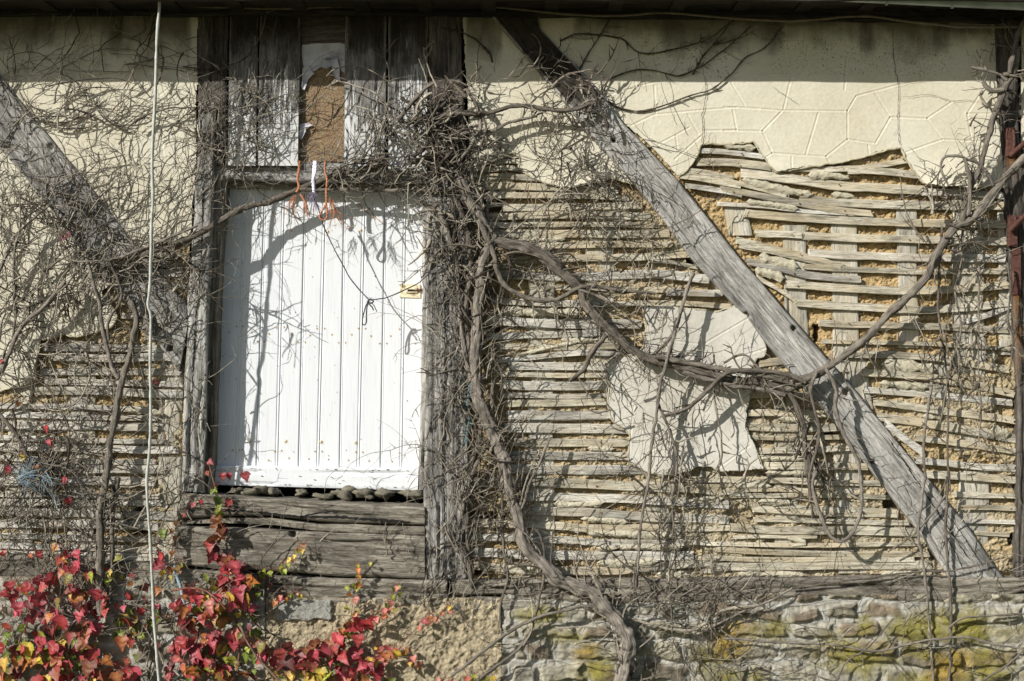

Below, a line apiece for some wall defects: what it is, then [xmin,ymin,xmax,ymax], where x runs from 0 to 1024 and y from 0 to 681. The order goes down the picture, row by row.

flaking render [678,140,1004,212]
flaking render [754,252,799,283]
flaking render [502,306,579,318]
flaking render [521,337,599,356]
flaking render [879,358,935,391]
flaking render [587,305,819,506]
flaking render [990,425,1010,438]
flaking render [553,499,689,578]
flaking render [786,536,806,547]